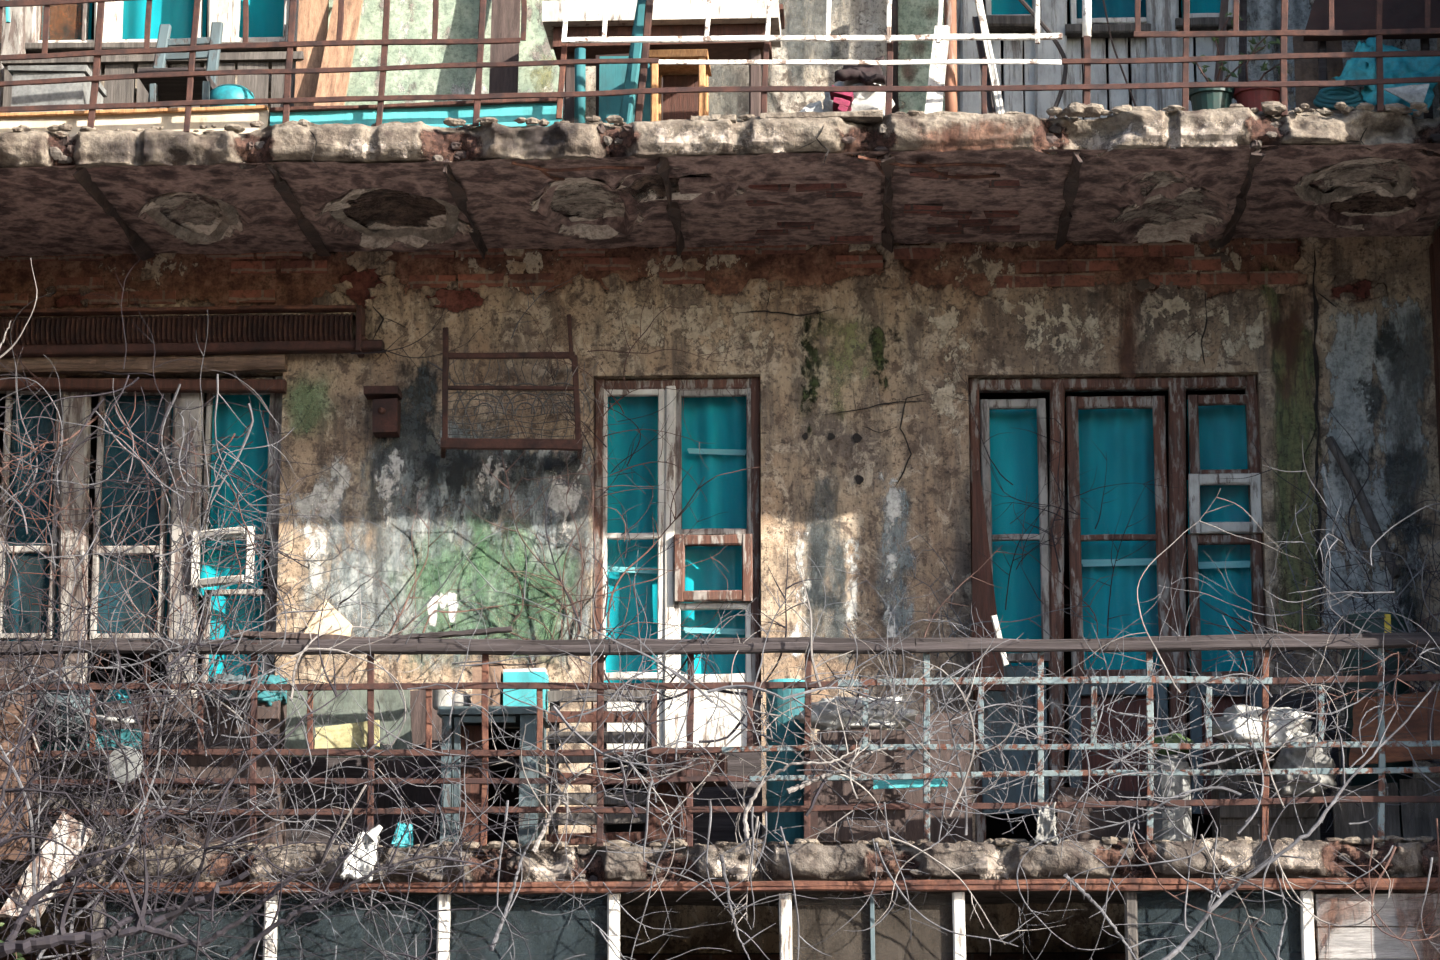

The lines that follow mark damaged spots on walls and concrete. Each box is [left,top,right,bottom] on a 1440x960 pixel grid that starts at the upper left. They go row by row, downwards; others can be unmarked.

peeling [50,136,75,164]
peeling [344,138,466,164]
peeling [651,125,784,153]
damp [292,360,594,666]
spalling [0,161,1432,657]
damp [790,477,859,662]
damp [1384,312,1431,628]